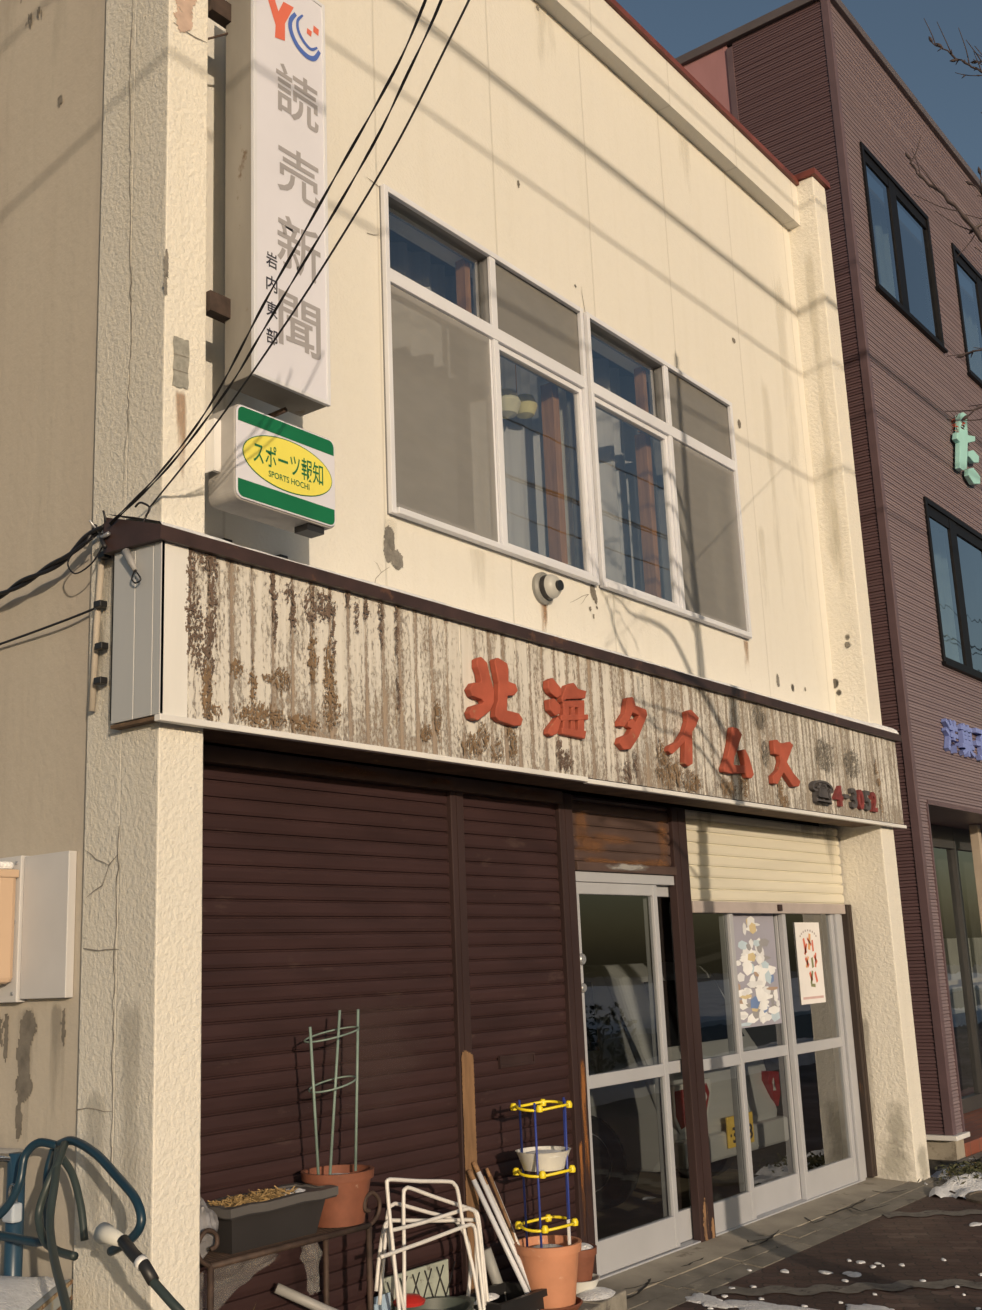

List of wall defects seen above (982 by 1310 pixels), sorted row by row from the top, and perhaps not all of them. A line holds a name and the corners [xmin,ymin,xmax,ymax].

peeling [383,525,403,570]
corrosion [613,862,643,870]
peeling [0,1010,37,1139]
crack [77,825,120,1205]